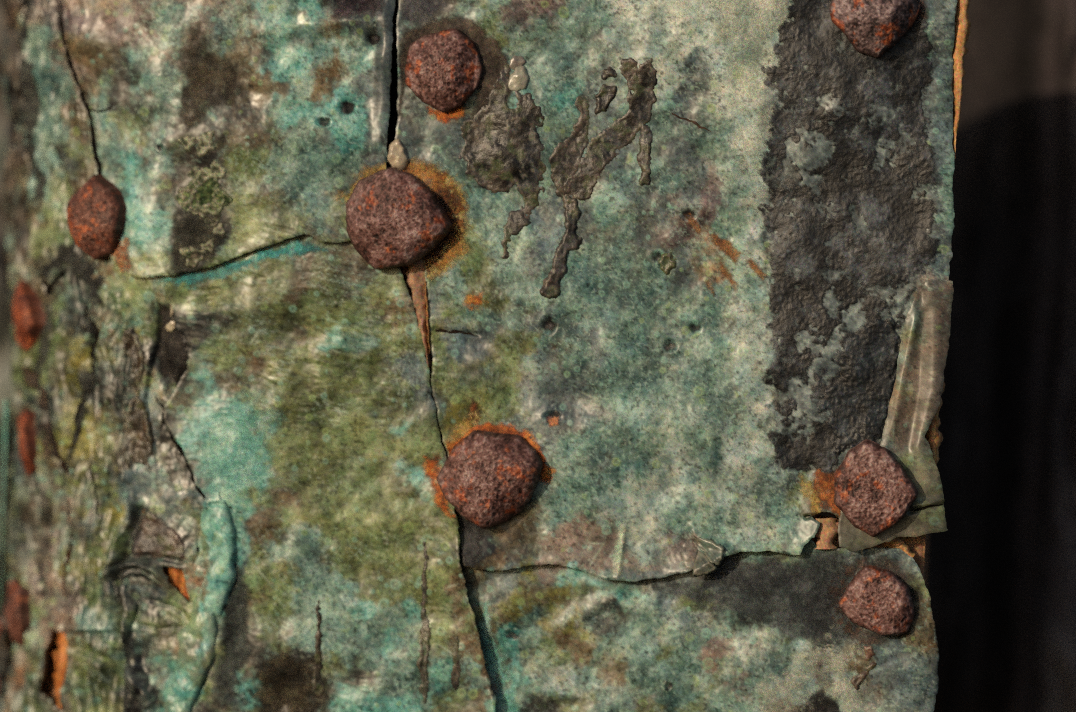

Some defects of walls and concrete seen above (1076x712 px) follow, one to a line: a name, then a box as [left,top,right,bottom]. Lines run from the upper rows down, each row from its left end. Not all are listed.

crack [7,0,33,177]
crack [59,0,114,174]
corrosion [429,106,464,123]
corrosion [113,238,131,272]
corrosion [403,162,467,278]
water stain [715,0,941,472]
crack [435,328,478,336]
peeling [131,510,185,559]
crack [155,396,232,509]
corrosion [425,400,555,517]
corrosion [801,468,841,515]
corrosion [830,558,922,645]